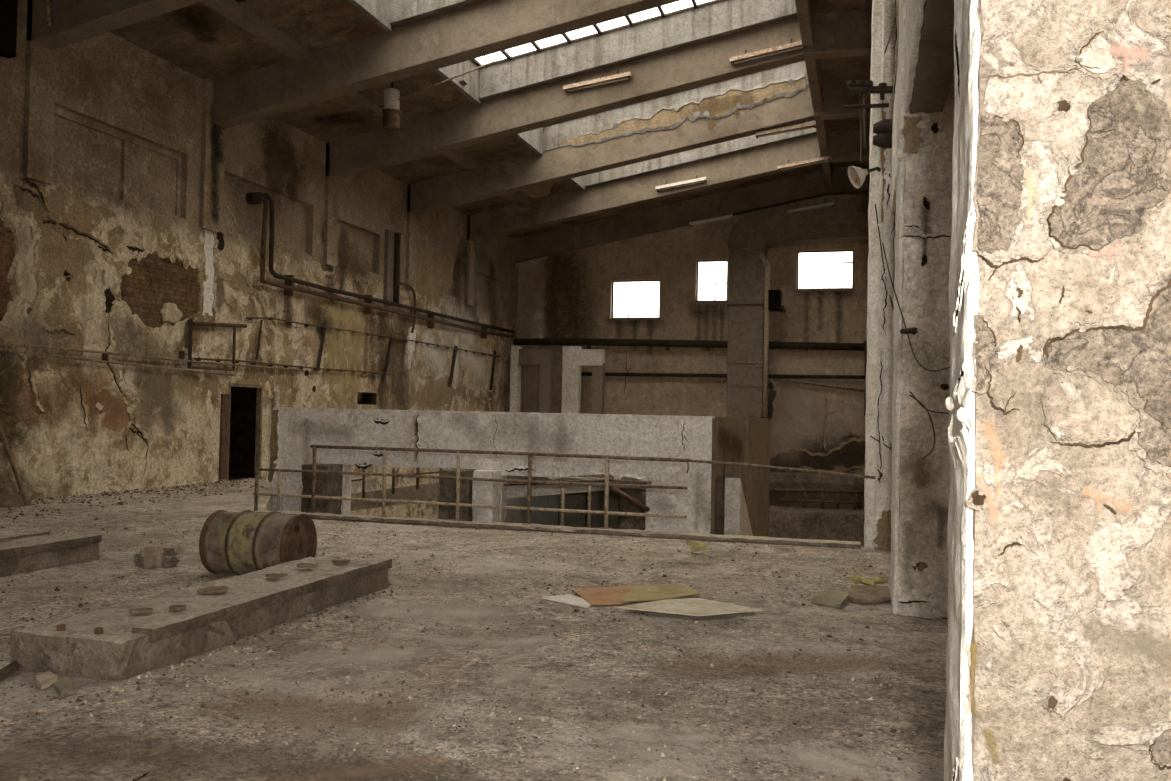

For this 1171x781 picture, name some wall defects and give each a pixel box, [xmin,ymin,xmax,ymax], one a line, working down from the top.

spalling [973,32,1171,262]
peeling [0,171,99,332]
crack [33,211,115,253]
spalling [112,230,254,335]
spalling [1041,262,1171,478]
spalling [1149,723,1171,769]